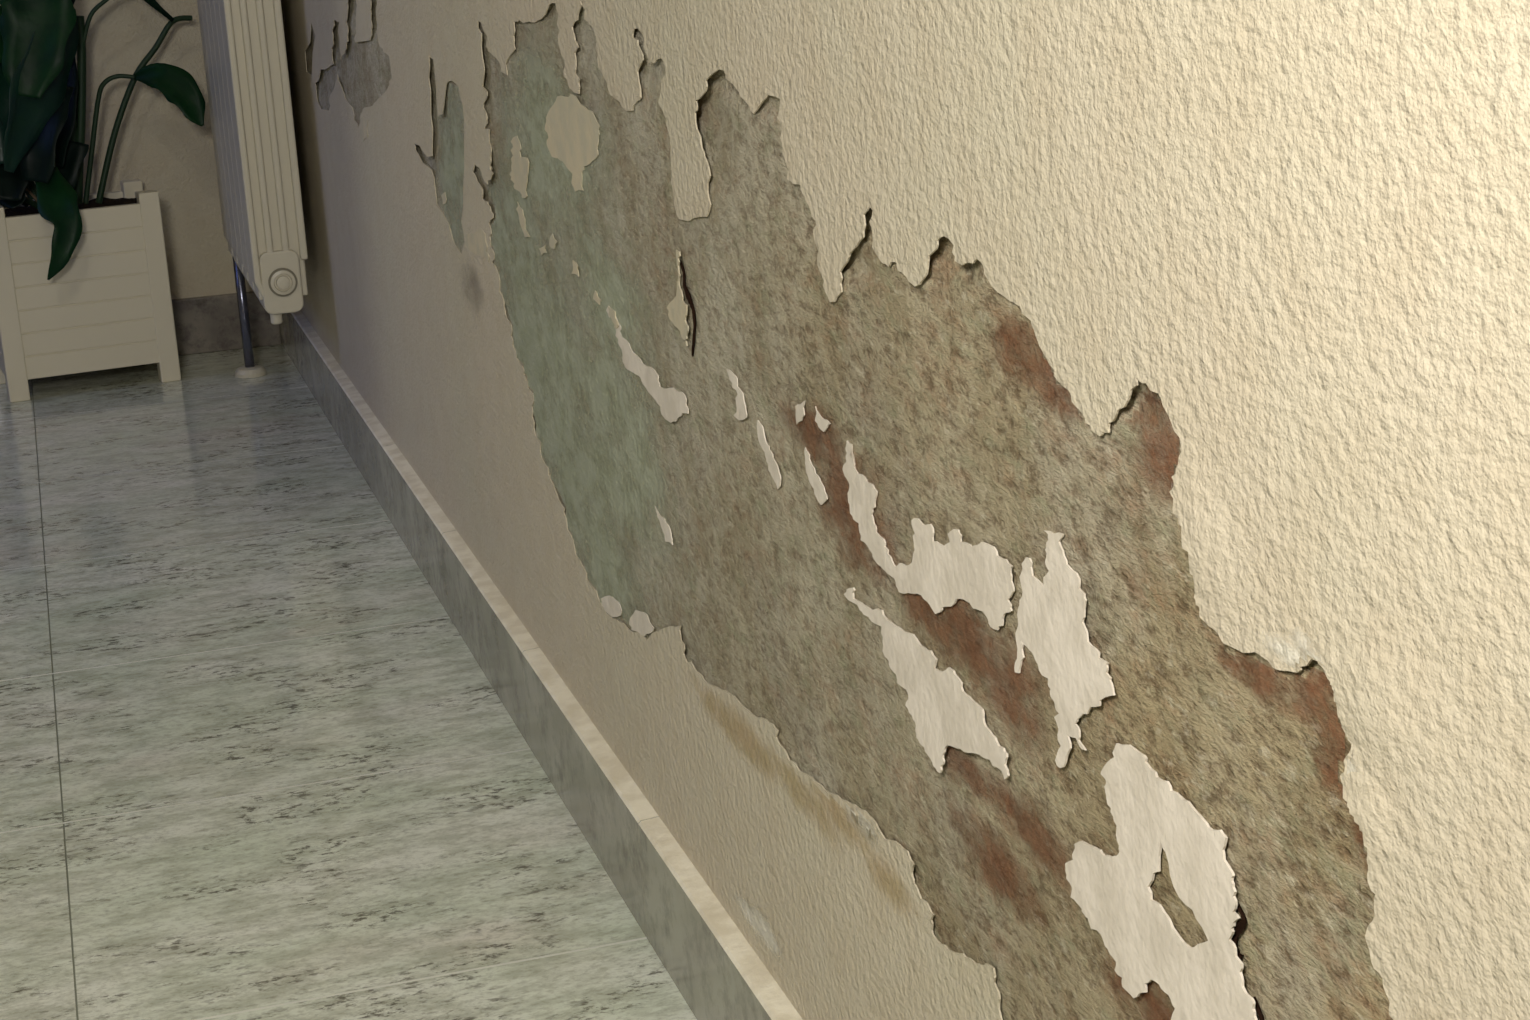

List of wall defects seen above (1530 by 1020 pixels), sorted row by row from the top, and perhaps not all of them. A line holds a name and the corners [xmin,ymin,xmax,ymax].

peeling [306,0,392,142]
peeling [415,1,1393,1020]